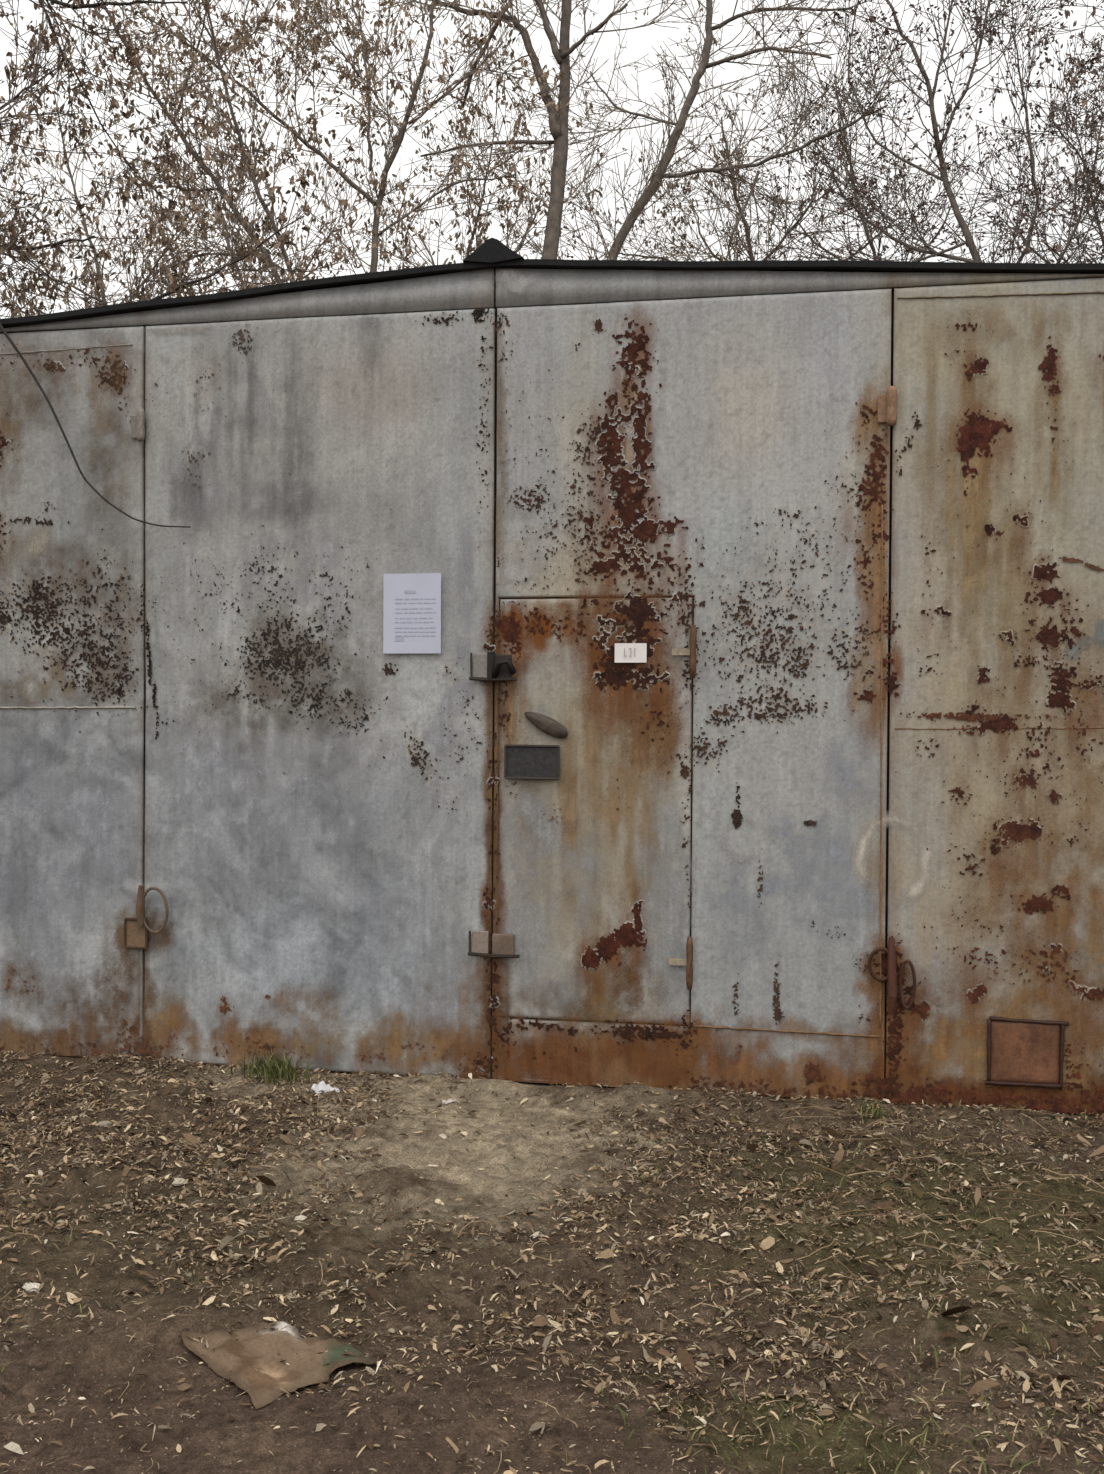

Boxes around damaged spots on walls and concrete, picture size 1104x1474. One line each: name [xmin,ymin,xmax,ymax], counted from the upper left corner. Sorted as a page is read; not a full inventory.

damp [249,615,349,716]
rust [0,309,1104,1115]